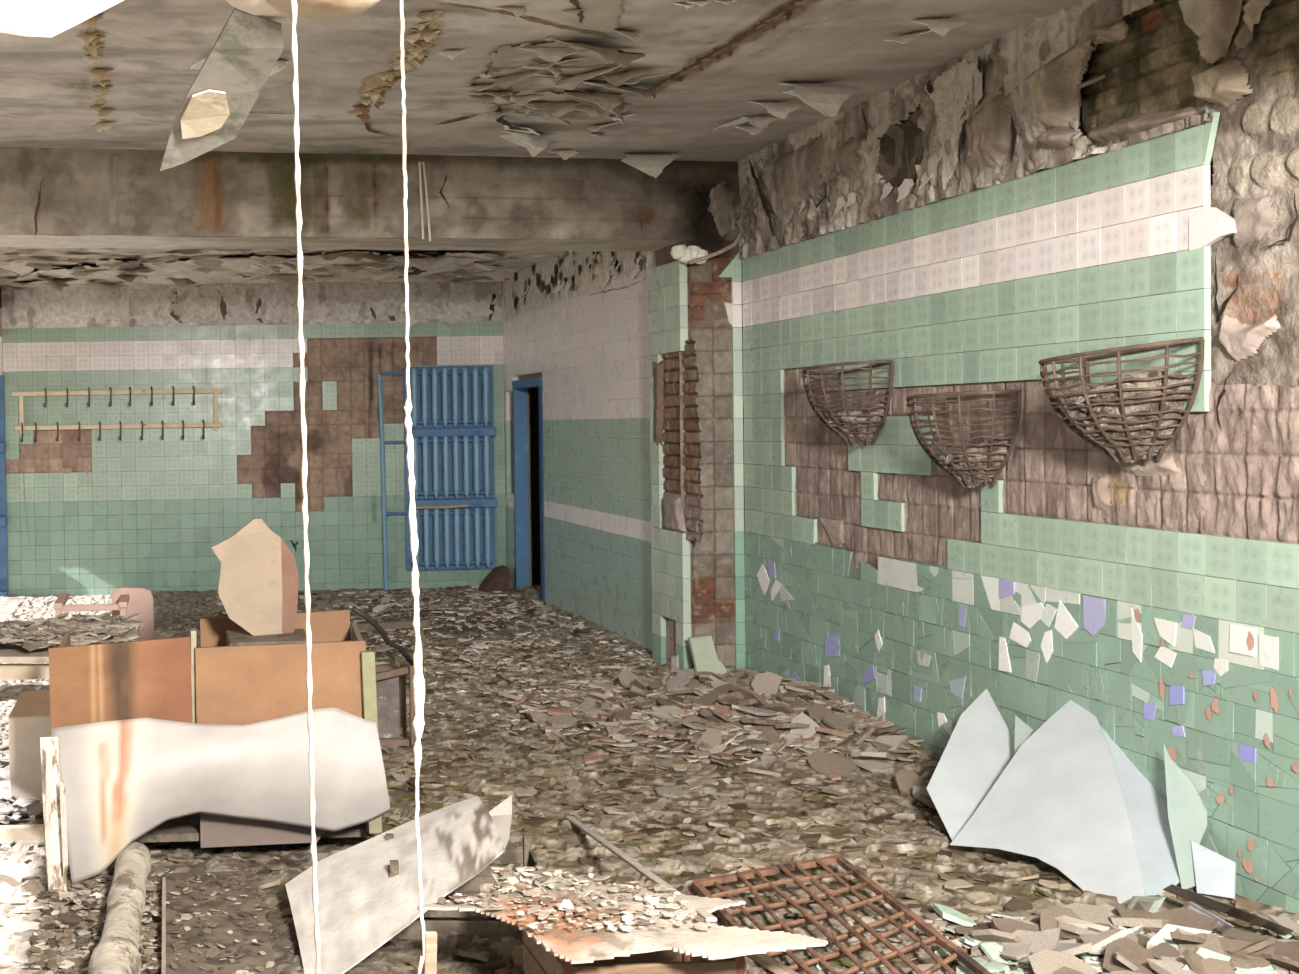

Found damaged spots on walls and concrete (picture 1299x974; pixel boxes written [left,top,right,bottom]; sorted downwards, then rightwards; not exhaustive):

peeling [0,251,644,512]
peeling [428,0,675,160]
peeling [653,245,740,672]
peeling [779,0,1299,569]